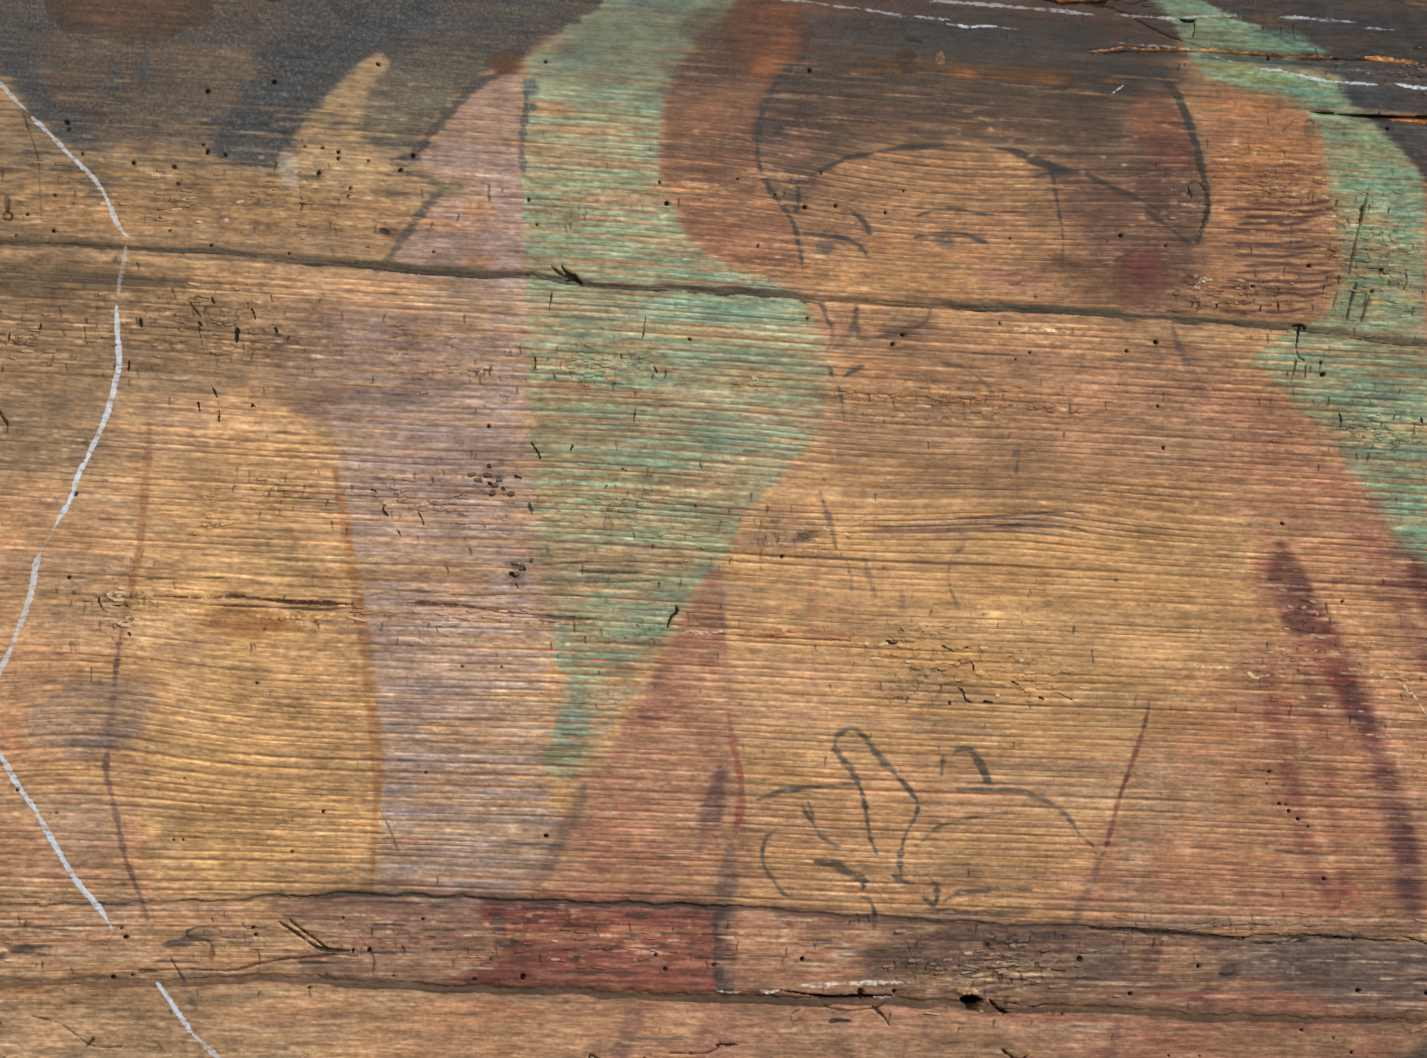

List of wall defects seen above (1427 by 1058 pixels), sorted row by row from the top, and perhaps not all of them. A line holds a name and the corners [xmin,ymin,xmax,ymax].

crack [1044,0,1106,8]
crack [551,265,582,285]
crack [1089,926,1348,945]